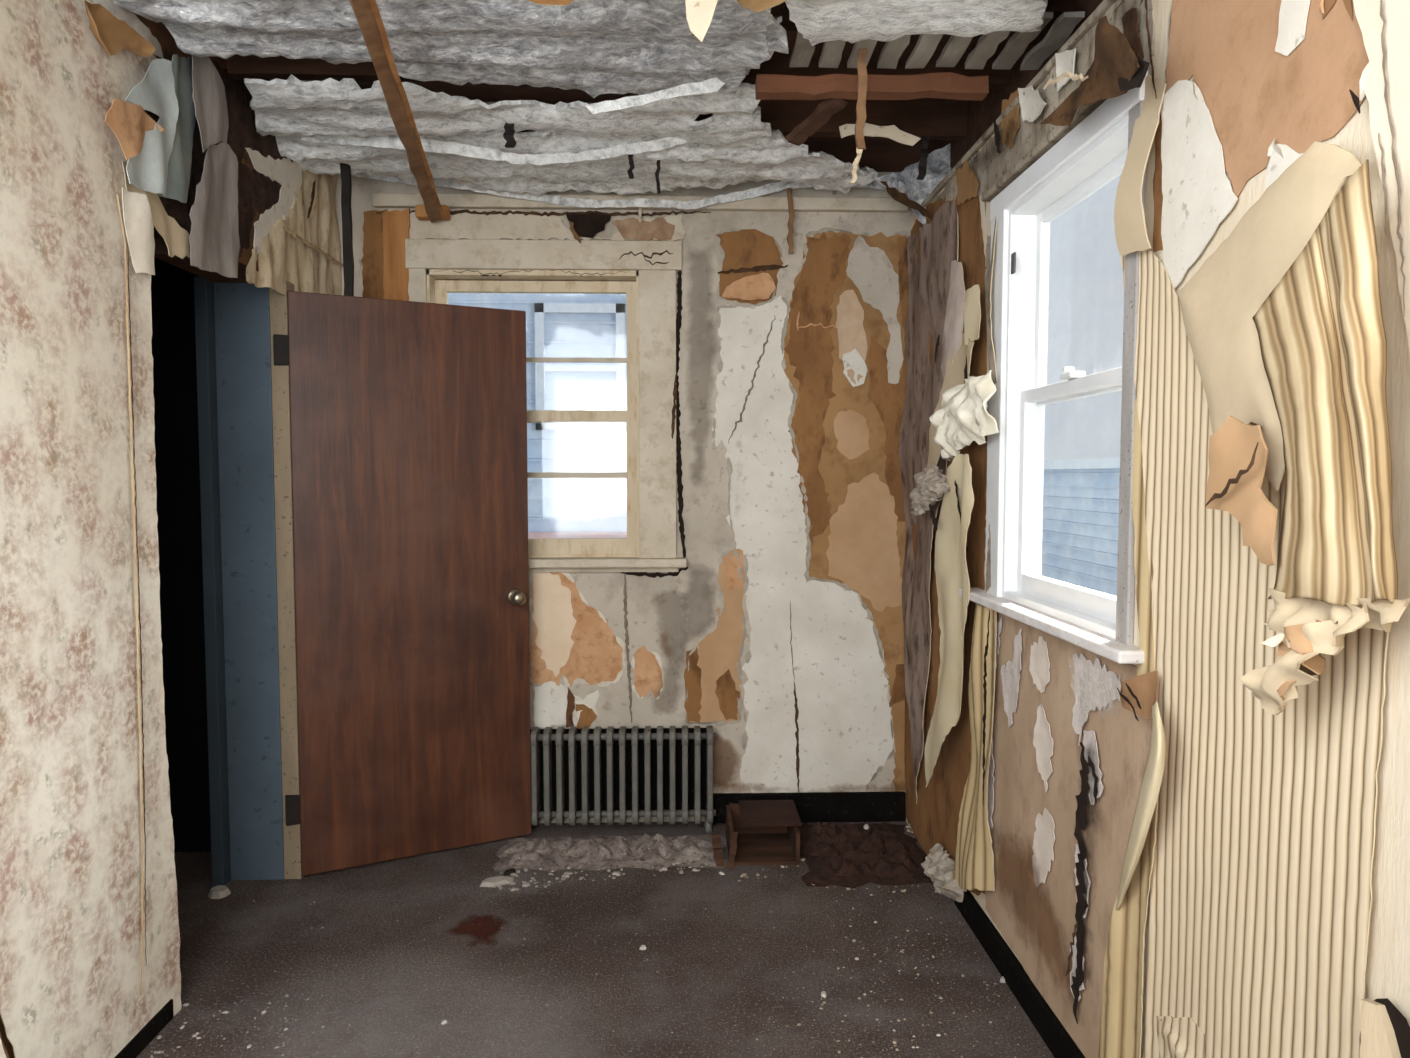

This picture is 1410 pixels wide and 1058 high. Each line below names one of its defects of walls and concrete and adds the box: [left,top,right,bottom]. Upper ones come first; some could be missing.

peeling [932,0,1369,289]
crack [1349,0,1405,317]
peeling [529,572,666,729]
flaking render [684,227,910,793]
peeling [985,612,1152,1058]